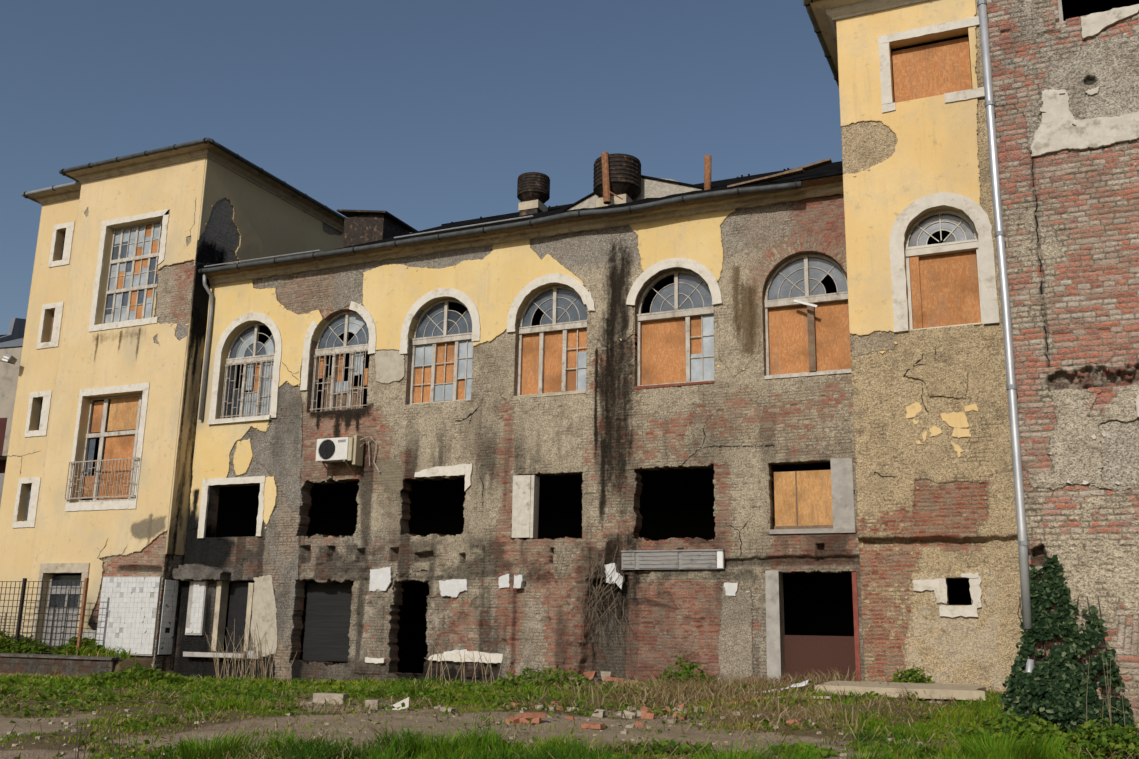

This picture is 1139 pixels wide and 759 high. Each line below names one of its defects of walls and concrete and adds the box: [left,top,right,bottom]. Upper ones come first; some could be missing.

spalling [841,121,898,177]
spalling [1023,19,1139,155]
spalling [154,198,240,345]
spalling [253,245,493,315]
spalling [527,225,643,350]
spalling [716,194,847,378]
spalling [89,532,168,630]
spalling [239,381,310,681]
leakage [594,244,638,515]
peeling [905,402,978,457]
spalling [909,479,988,514]
spalling [1028,358,1139,492]